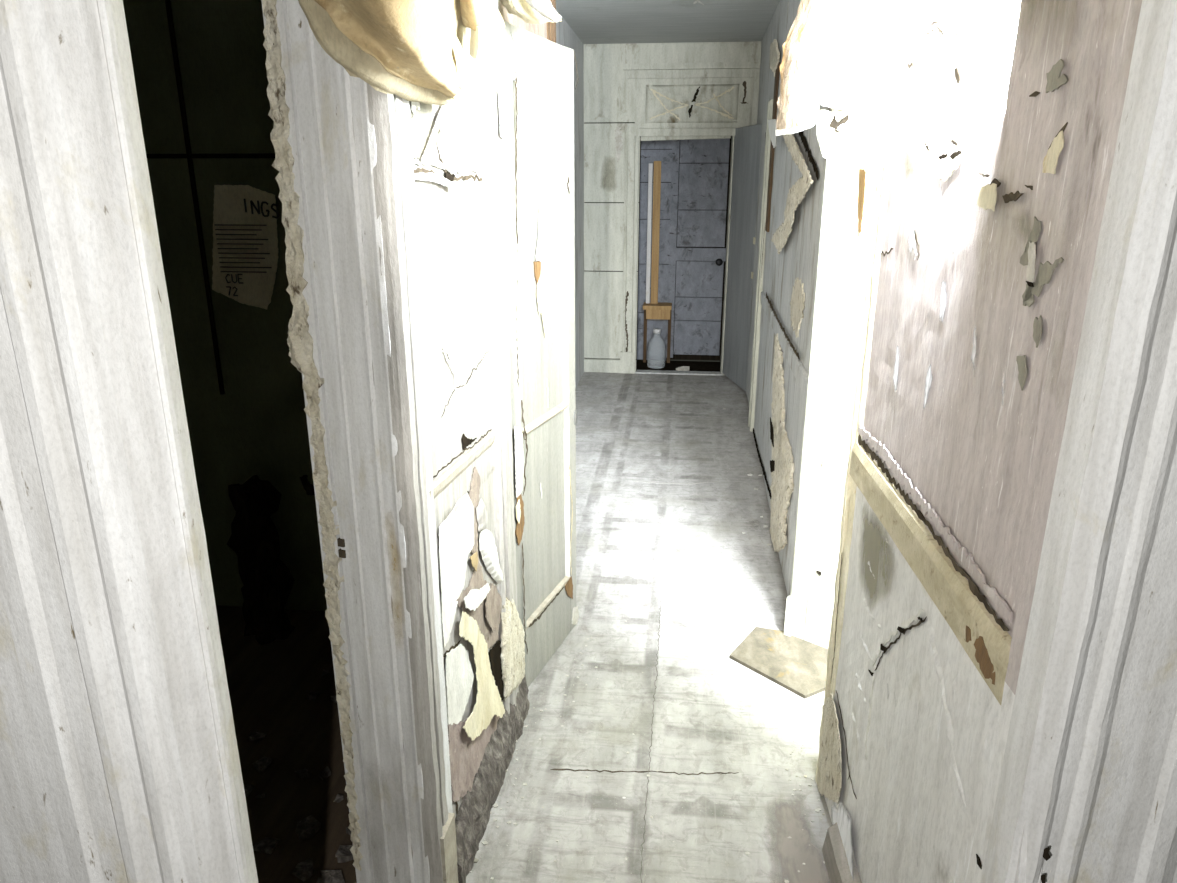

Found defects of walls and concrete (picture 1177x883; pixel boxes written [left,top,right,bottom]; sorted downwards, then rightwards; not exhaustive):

crack [413,141,484,182]
peeling [768,0,854,254]
peeling [977,172,1033,211]
flaking render [262,0,363,871]
crack [432,429,492,478]
crack [441,348,489,418]
crack [515,71,548,495]
peeling [1016,216,1064,390]
flaking render [448,715,500,802]
flaking render [456,467,504,702]
crack [831,554,857,799]
crack [868,608,927,676]